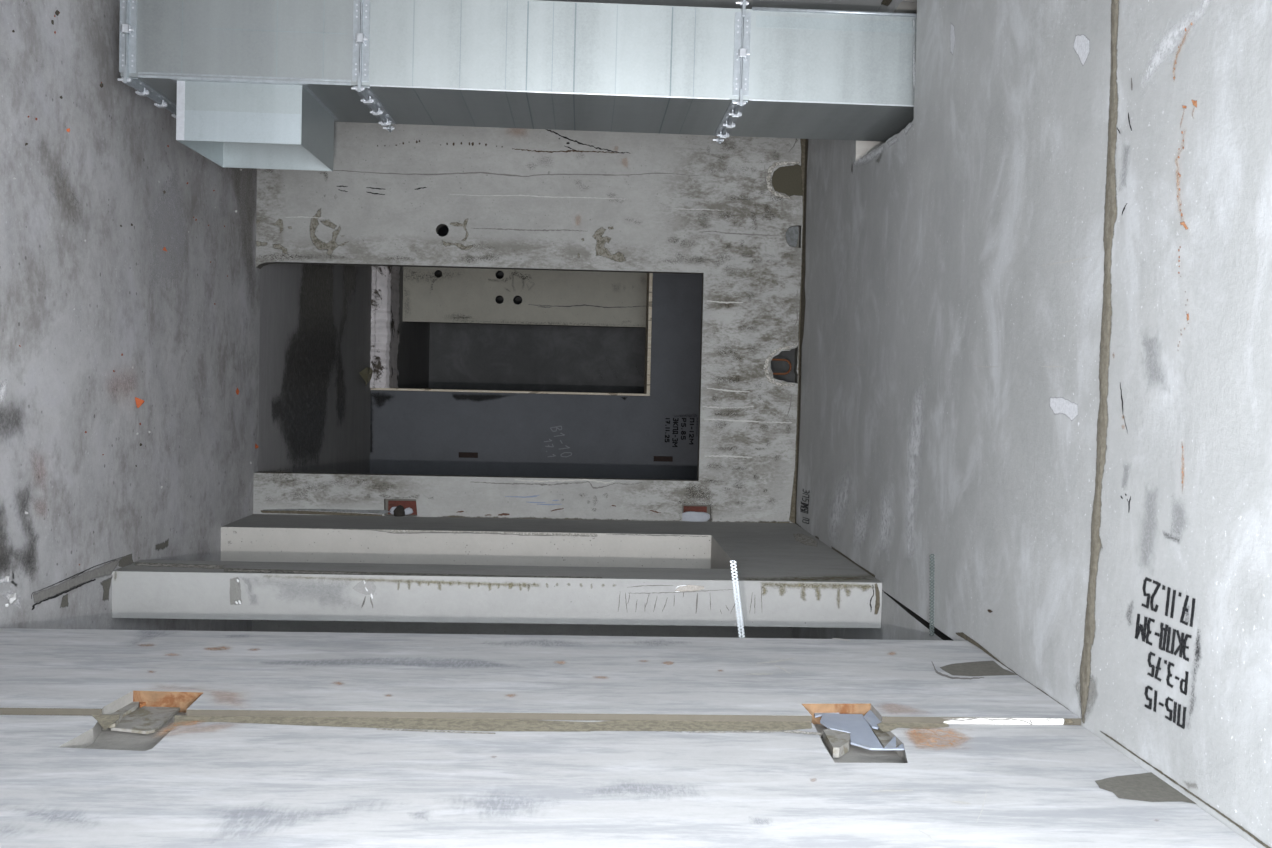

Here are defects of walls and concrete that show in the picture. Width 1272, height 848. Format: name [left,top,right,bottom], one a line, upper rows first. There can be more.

water stain [0,496,35,605]